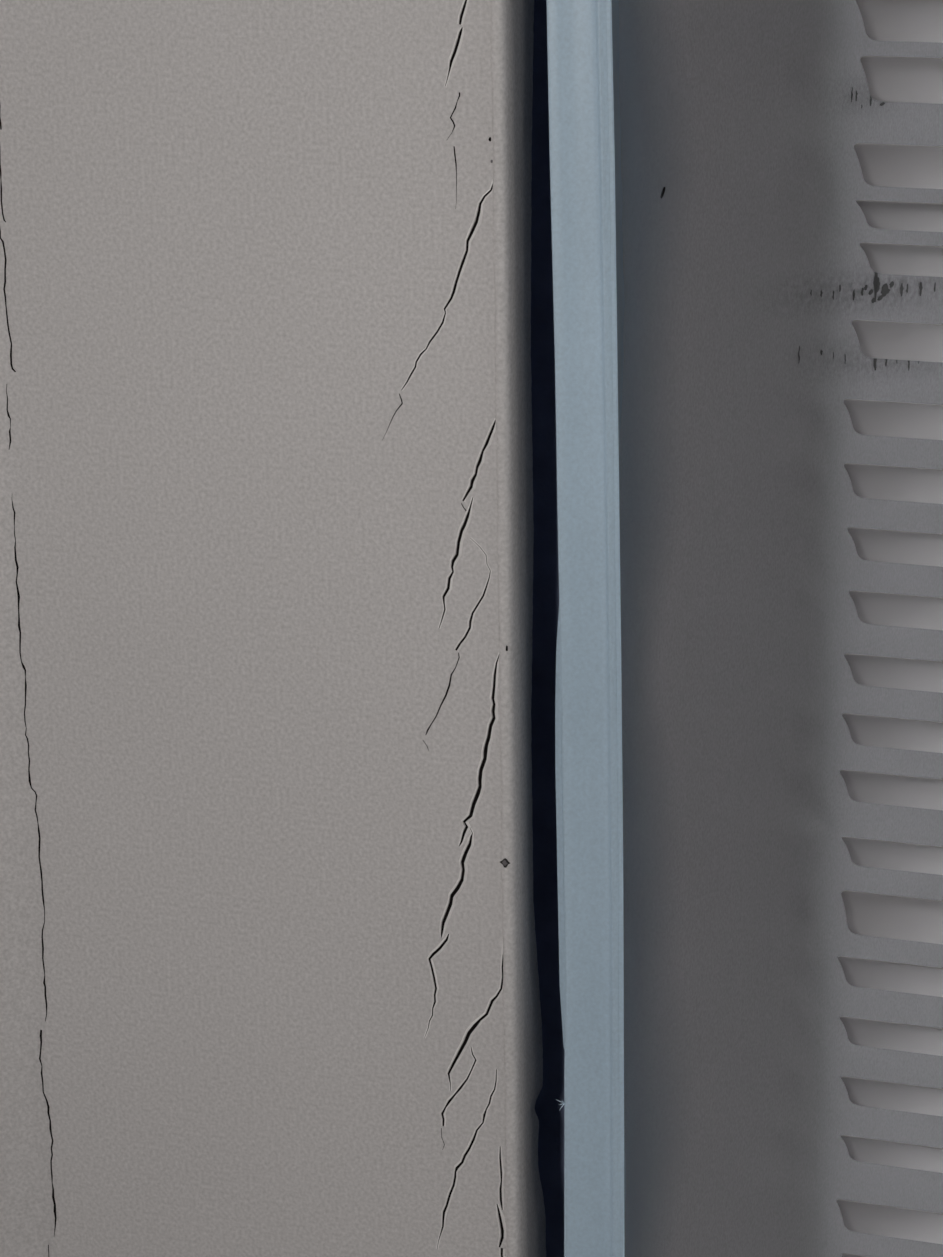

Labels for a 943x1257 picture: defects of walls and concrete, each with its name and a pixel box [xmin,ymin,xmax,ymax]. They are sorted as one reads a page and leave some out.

crack [0,160,16,449]
crack [384,0,493,436]
crack [424,418,496,750]
crack [12,501,57,1256]
crack [424,652,499,1038]
crack [436,944,506,1257]